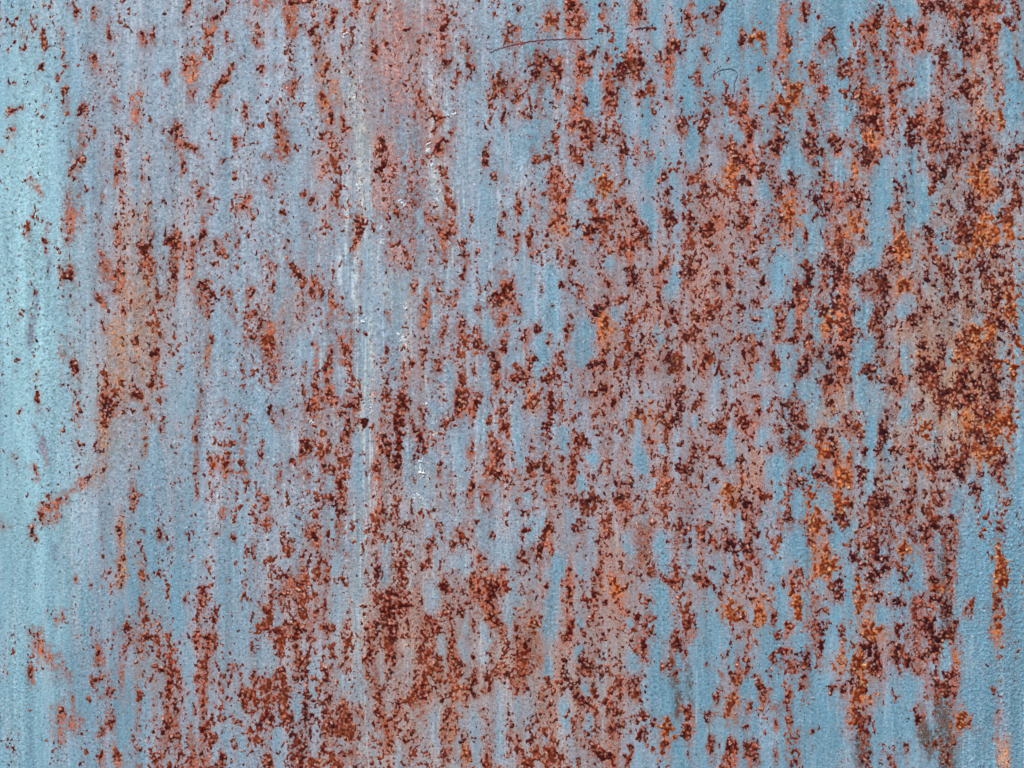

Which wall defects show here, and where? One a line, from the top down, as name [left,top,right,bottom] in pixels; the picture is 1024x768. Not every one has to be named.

corrosion [173,0,247,109]
corrosion [738,21,769,54]
corrosion [0,274,49,411]
corrosion [960,594,985,619]
corrosion [0,615,71,699]
corrosion [45,695,88,765]